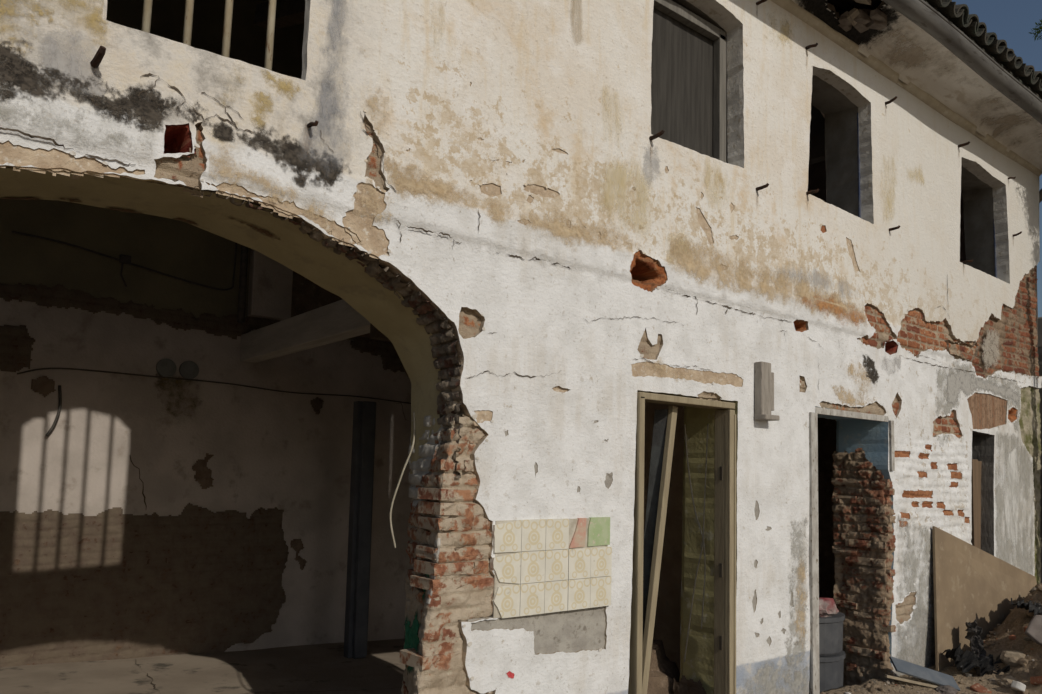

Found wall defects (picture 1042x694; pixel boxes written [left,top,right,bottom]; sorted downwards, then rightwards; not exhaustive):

spalling [826,0,887,33]
damp [0,0,169,131]
damp [213,71,343,187]
damp [390,165,477,206]
damp [532,215,617,245]
spalling [630,248,668,292]
damp [671,238,867,322]
peeling [631,328,743,401]
flaking render [0,109,607,694]
crack [130,455,147,508]
flaking render [819,265,1042,686]